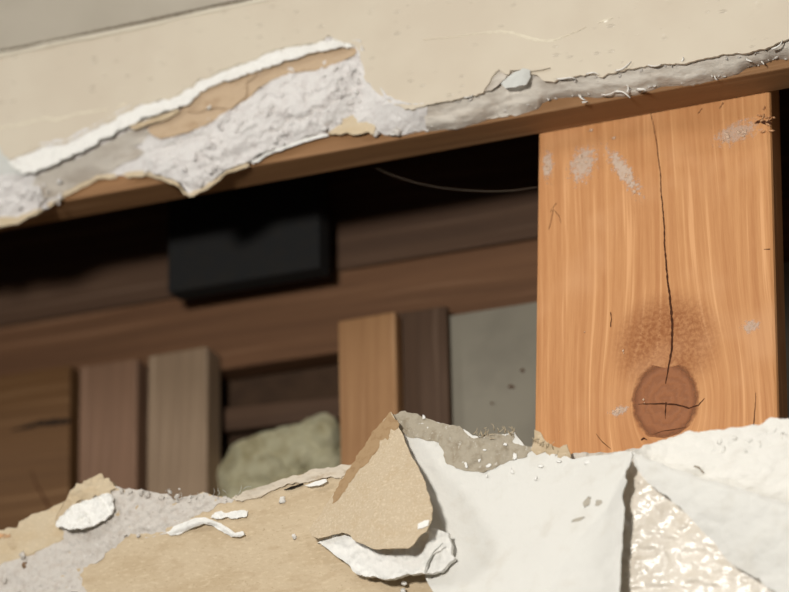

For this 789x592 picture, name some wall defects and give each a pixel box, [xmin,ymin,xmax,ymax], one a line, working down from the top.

spalling [0,36,428,227]
peeling [485,68,531,92]
crack [638,115,705,435]